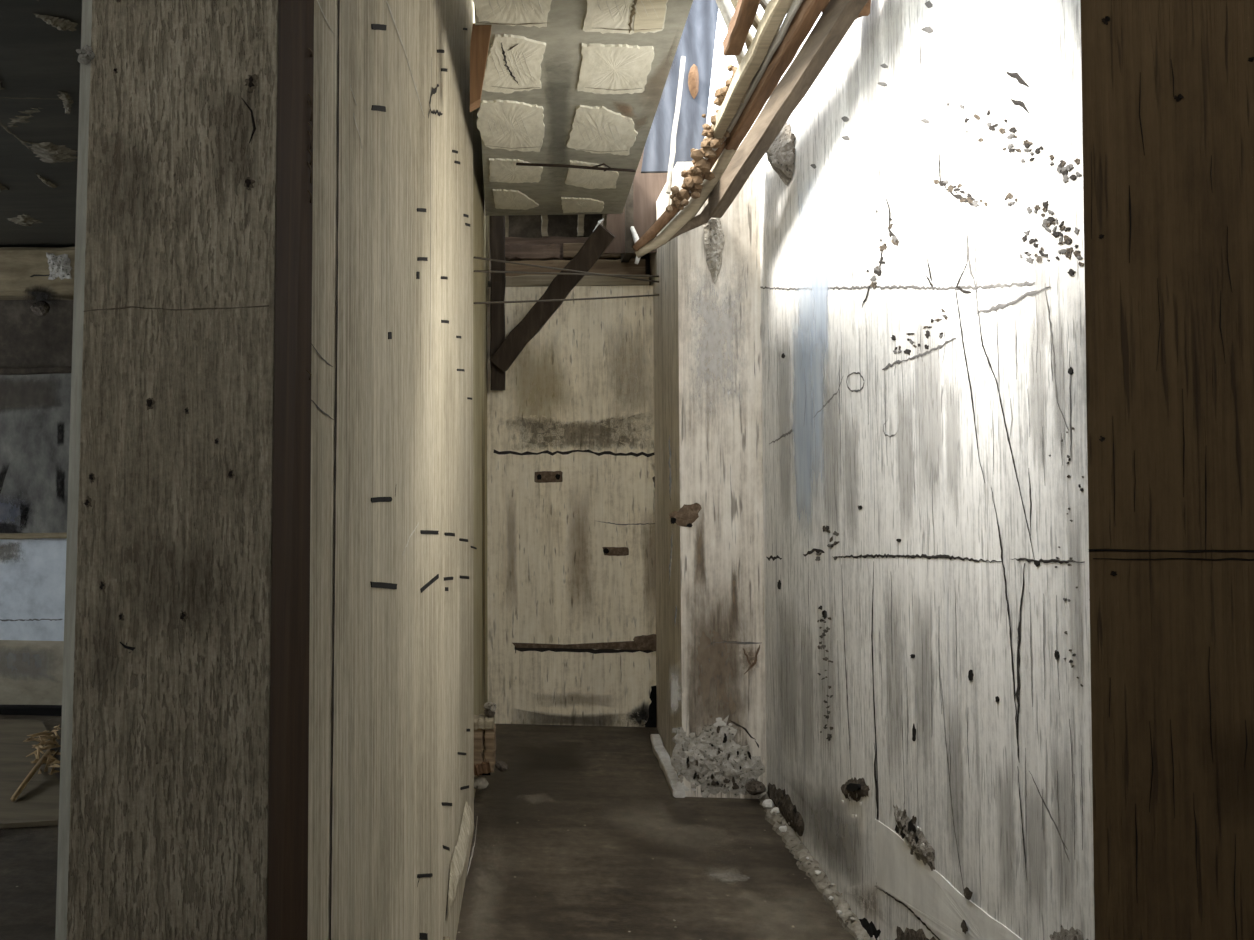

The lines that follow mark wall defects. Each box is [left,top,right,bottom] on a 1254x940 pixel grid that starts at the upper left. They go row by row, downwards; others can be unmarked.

crack [938,157,979,206]
damp [515,360,644,449]
damp [794,210,828,511]
crack [768,197,1083,878]
spalling [671,715,804,836]
spalling [859,918,936,940]
spalling [1050,925,1088,940]